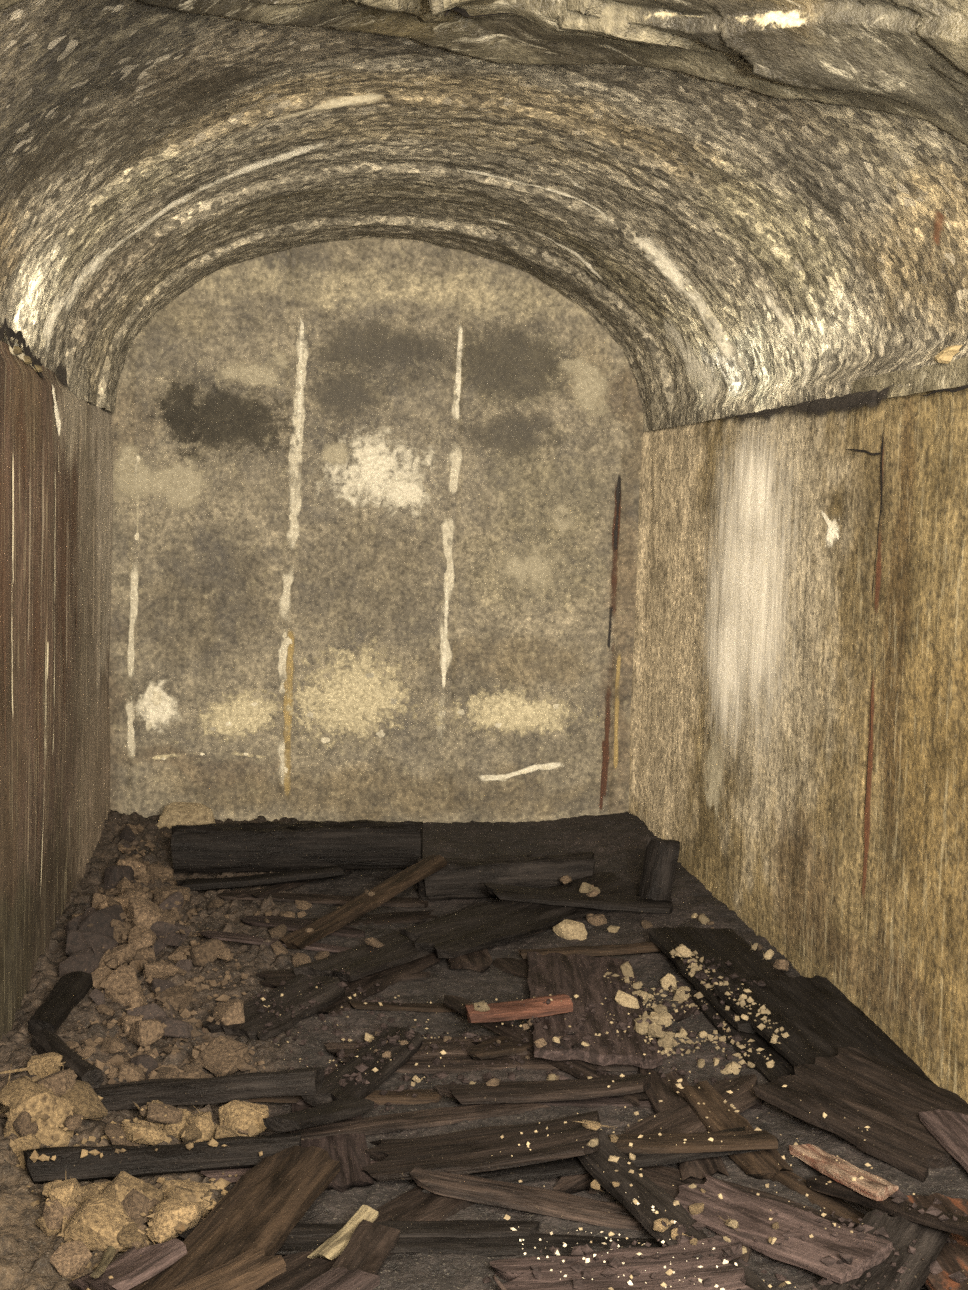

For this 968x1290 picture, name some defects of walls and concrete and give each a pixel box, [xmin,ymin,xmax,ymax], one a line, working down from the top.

damp [126,696,136,757]
damp [127,566,139,678]
damp [277,566,294,792]
damp [113,320,462,548]
damp [437,518,455,735]
damp [451,325,608,419]
rust [600,476,621,809]
damp [705,439,790,824]
damp [821,511,839,548]